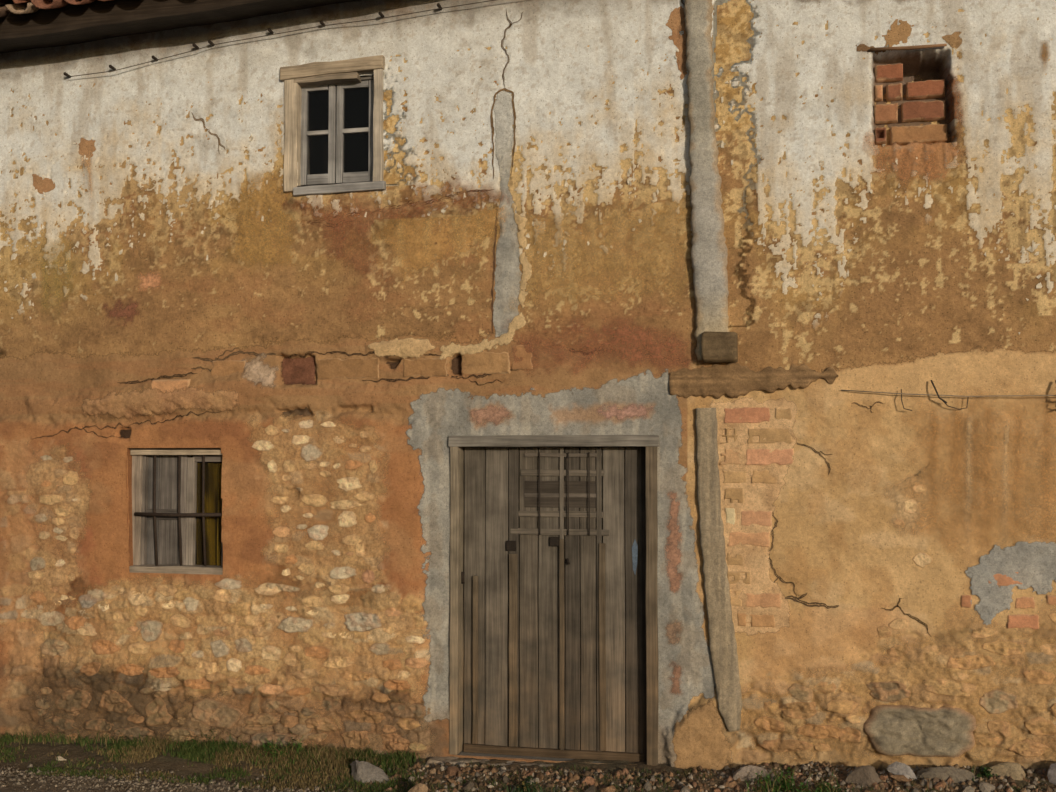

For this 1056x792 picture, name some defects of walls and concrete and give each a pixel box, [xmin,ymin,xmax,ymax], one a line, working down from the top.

crack [501,11,523,86]
crack [191,112,225,154]
peeling [0,0,1056,387]
spalling [151,379,191,393]
crack [117,346,513,386]
crack [34,411,220,439]
crack [796,441,833,474]
spalling [709,397,797,636]
crack [769,512,839,609]
crack [880,598,931,636]
spalling [743,605,1056,769]